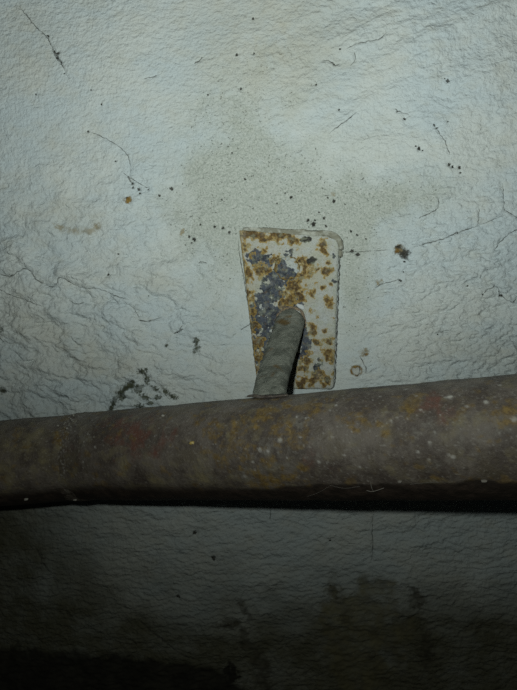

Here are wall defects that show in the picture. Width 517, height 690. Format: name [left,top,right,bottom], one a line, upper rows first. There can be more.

leakage [108,368,178,411]